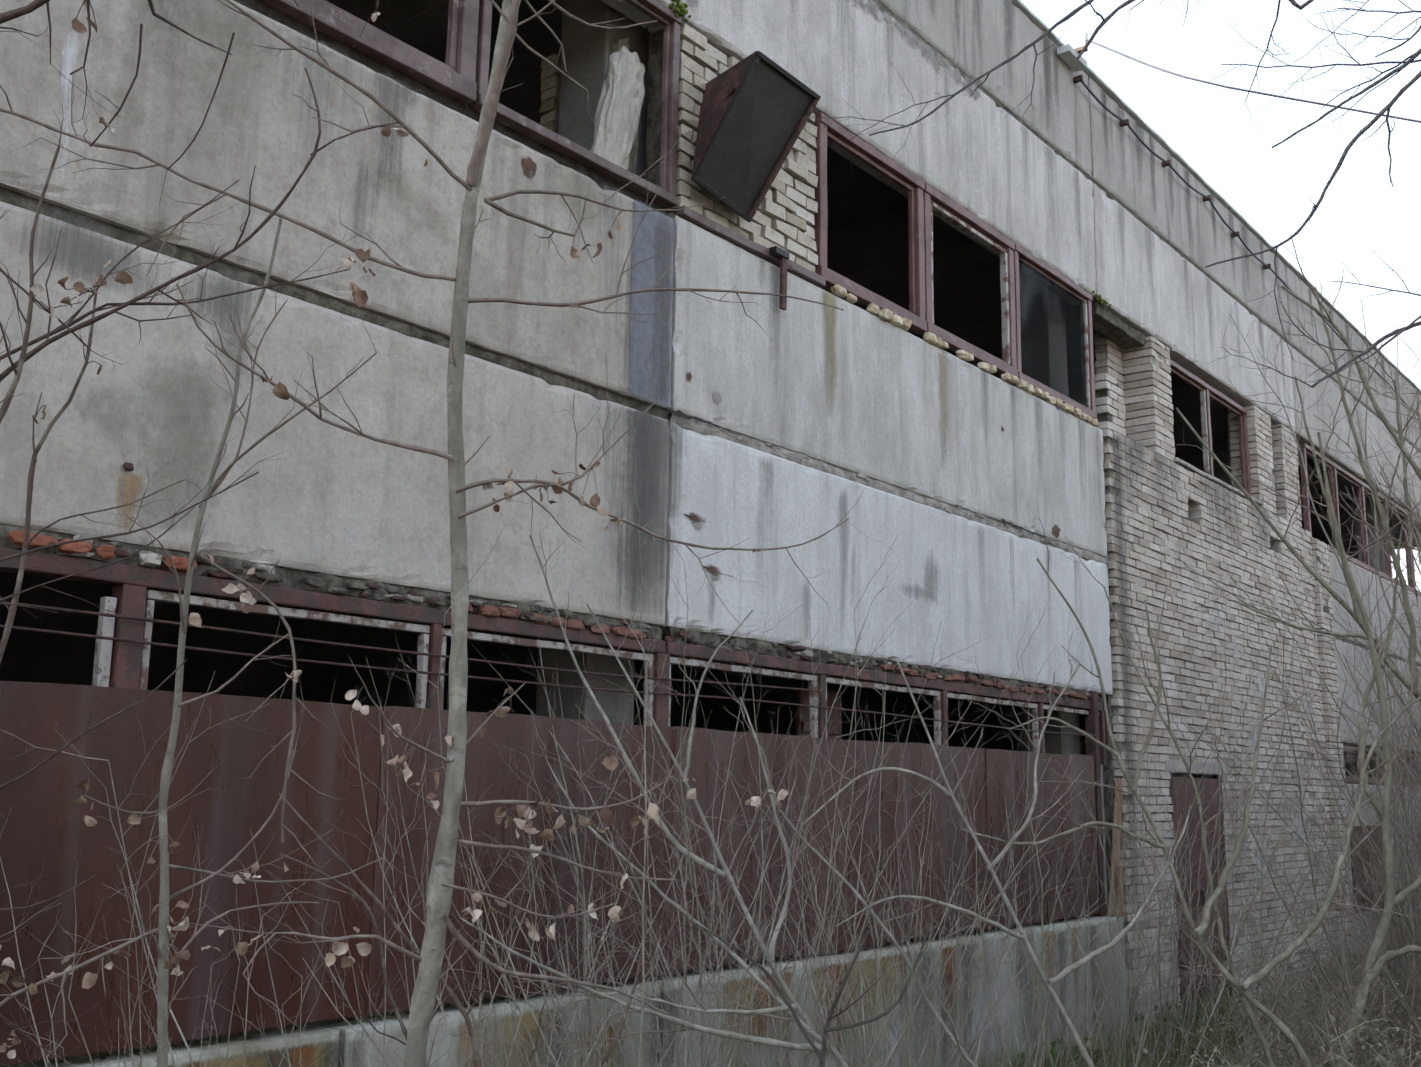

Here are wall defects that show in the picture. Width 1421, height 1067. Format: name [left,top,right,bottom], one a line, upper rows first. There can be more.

damp [628,201,682,591]
corrosion [121,462,141,520]
spalling [0,523,451,611]
spalling [703,565,721,580]
spalling [468,596,1103,703]
corrosion [495,1011,550,1067]
corrosion [726,972,791,1057]
corrosion [815,955,906,1051]
corrosion [941,947,957,1042]